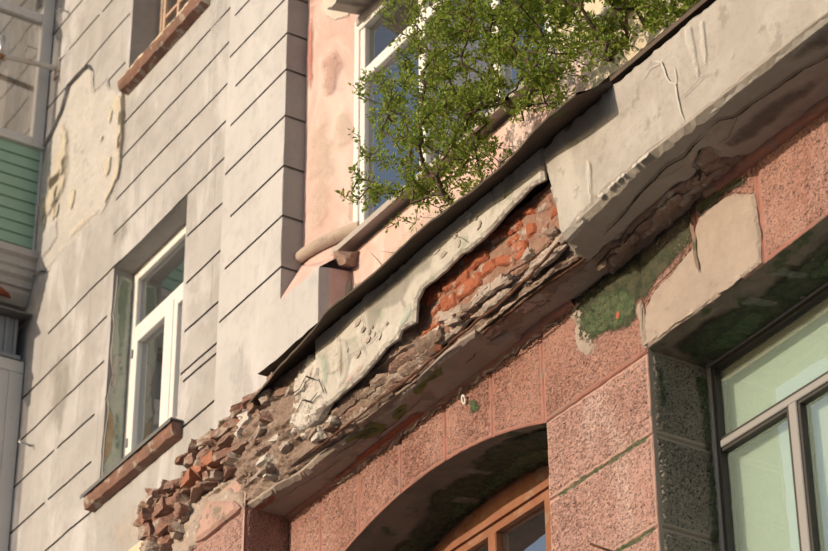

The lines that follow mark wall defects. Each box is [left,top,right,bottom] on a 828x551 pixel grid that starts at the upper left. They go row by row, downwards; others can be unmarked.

peeling [321,0,349,20]
flaking render [33,64,125,277]
peeling [100,275,132,478]
flaking render [133,146,743,551]
spalling [636,193,763,348]
crack [604,56,828,235]